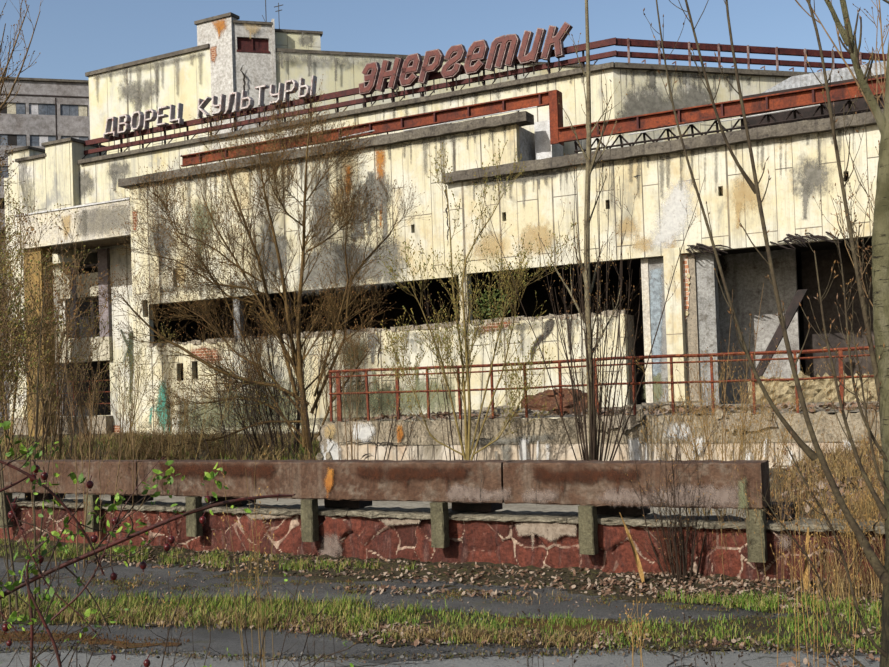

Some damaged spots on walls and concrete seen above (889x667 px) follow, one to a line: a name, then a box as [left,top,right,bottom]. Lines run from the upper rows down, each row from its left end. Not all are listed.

water stain [118,68,158,127]
water stain [618,70,716,118]
rust [376,150,385,179]
water stain [793,160,828,219]
water stain [253,171,404,290]
rust [325,469,333,491]
spalling [516,522,577,547]